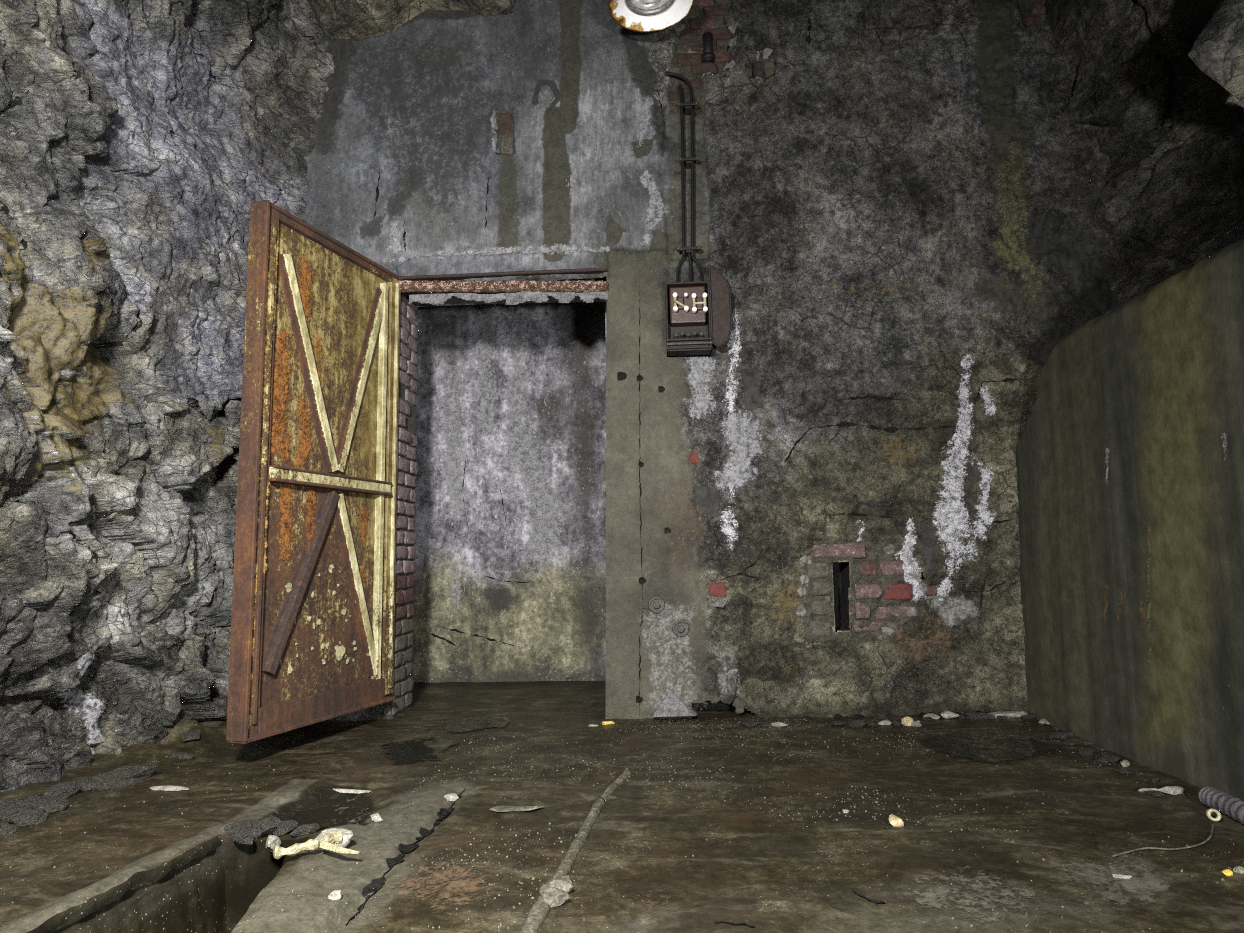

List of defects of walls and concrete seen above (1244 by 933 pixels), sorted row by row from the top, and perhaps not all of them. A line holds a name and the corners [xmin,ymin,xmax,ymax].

spalling [663,0,738,118]
spalling [752,48,775,81]
corrosion [297,256,312,322]
corrosion [270,327,312,467]
corrosion [278,484,316,563]
corrosion [313,334,323,390]
damp [683,311,780,549]
damp [894,353,997,603]
spalling [795,539,937,643]